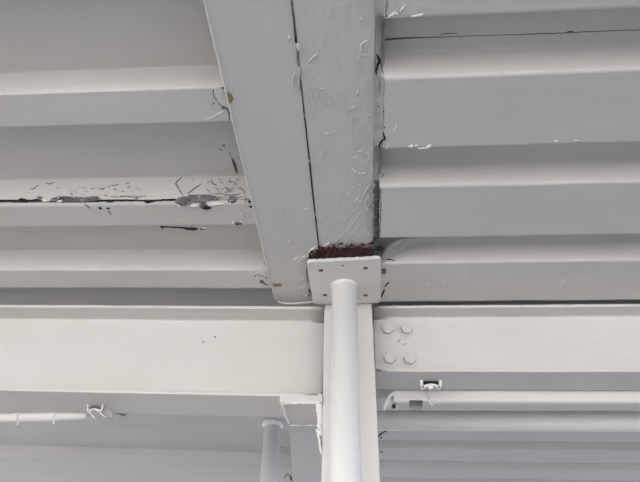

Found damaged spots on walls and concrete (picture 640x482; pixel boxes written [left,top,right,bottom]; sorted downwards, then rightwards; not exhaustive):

crack [385,30,635,41]
peeling [36,196,111,214]
peeling [175,193,252,210]
corrosion [309,241,374,259]